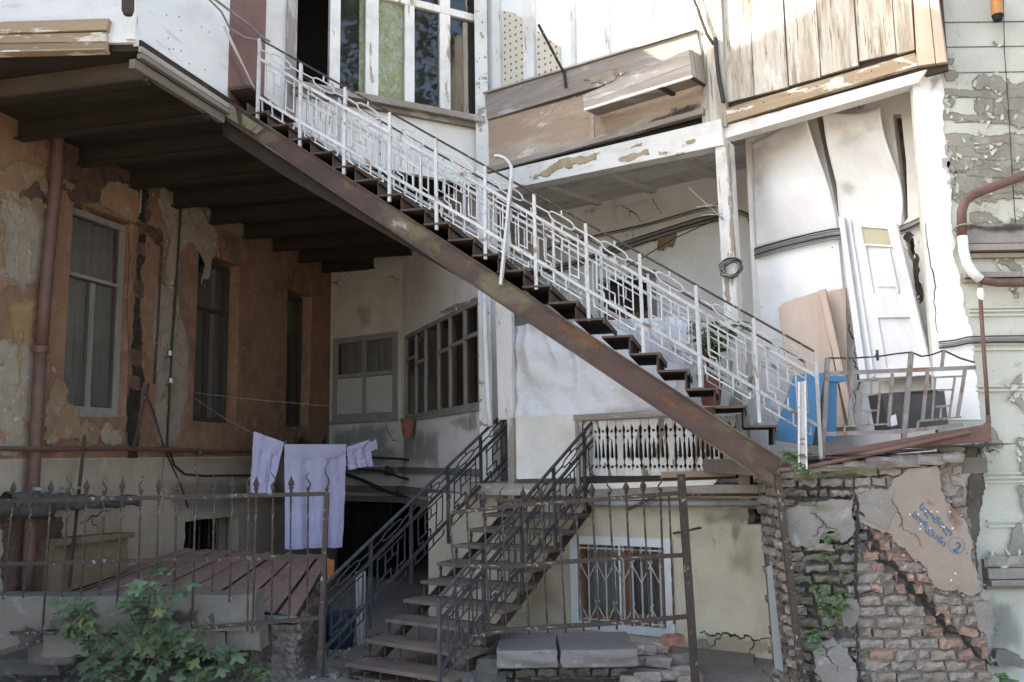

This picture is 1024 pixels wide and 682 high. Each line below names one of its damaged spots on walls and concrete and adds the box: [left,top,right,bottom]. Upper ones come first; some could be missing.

peeling [0,160,49,294]
peeling [62,142,244,445]
peeling [530,153,597,180]
peeling [618,143,669,162]
peeling [941,52,1024,224]
peeling [0,338,35,459]
peeling [43,365,124,446]
peeling [972,362,1024,568]
crack [699,631,771,653]
crack [811,478,992,682]